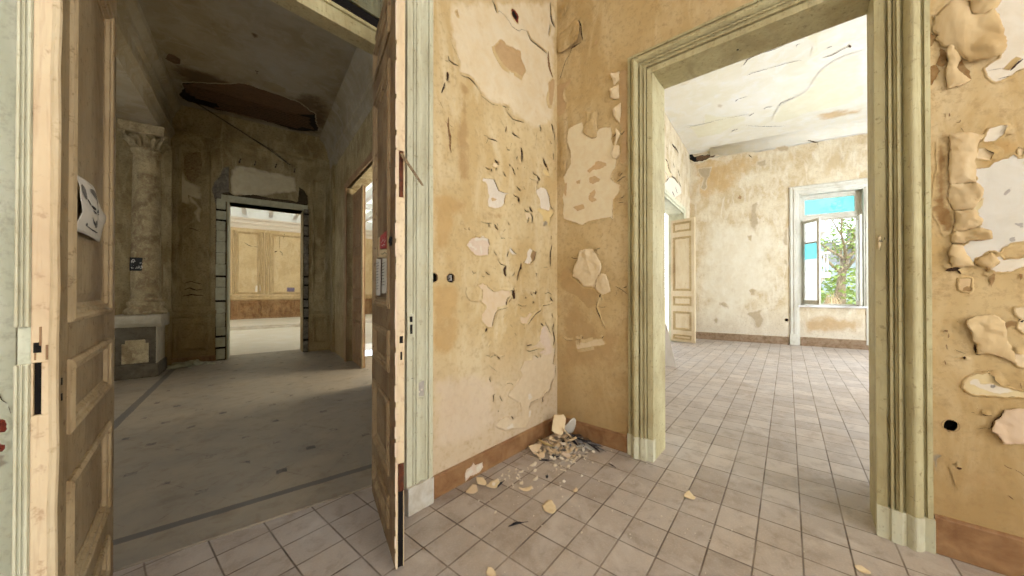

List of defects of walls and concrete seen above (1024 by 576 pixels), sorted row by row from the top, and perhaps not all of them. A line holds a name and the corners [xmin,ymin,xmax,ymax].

peeling [982,0,1024,84]
peeling [443,0,621,228]
crack [730,44,851,131]
peeling [182,150,308,224]
peeling [465,233,492,257]
peeling [508,245,538,268]
crack [440,39,607,419]
peeling [559,249,611,309]
peeling [943,123,1024,277]
peeling [477,282,557,432]
peeling [575,337,606,352]
peeling [960,305,1024,444]